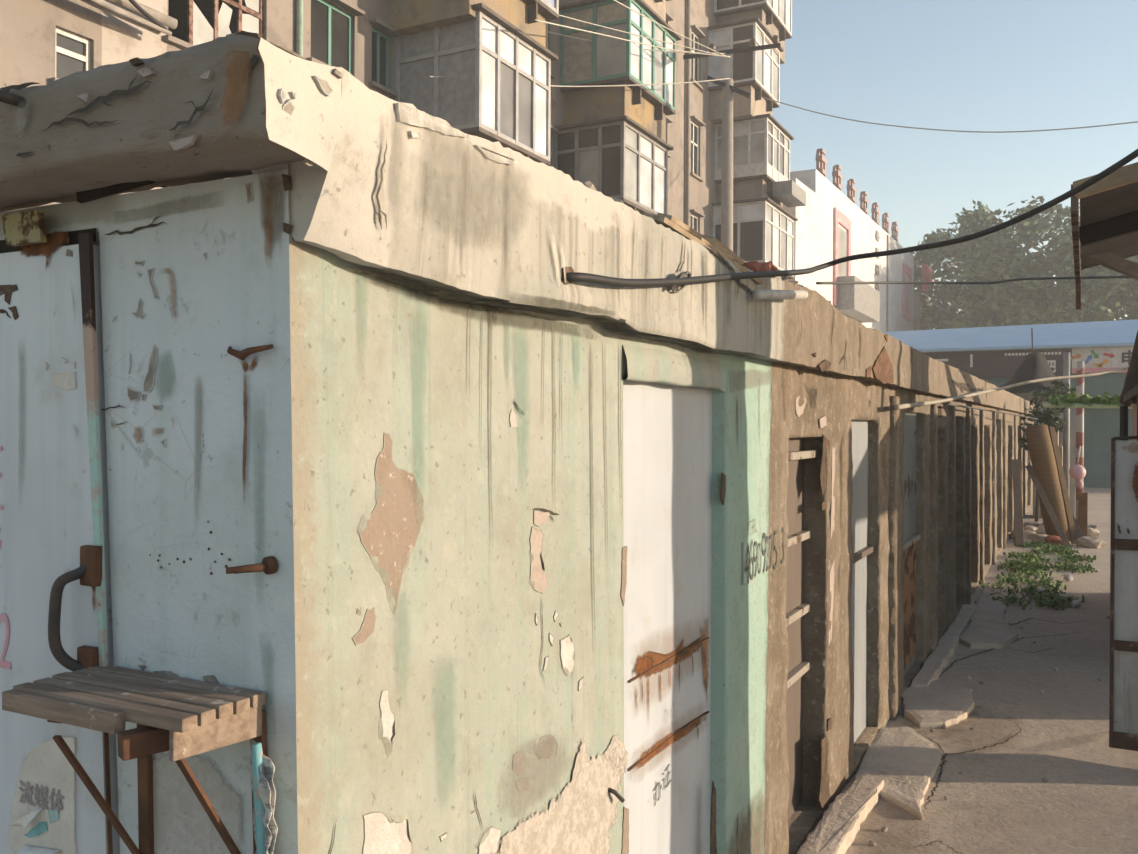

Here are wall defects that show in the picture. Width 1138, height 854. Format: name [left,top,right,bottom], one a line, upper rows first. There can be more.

crack [16,75,153,157]
rust [220,51,249,124]
crack [376,141,387,228]
crack [105,215,167,241]
leakage [365,273,742,507]
leakage [591,352,621,594]
peeling [357,433,425,615]
rust [633,630,709,711]
peeling [379,689,396,757]
rust [638,718,701,768]
peeling [362,811,413,854]
peeling [477,735,629,854]